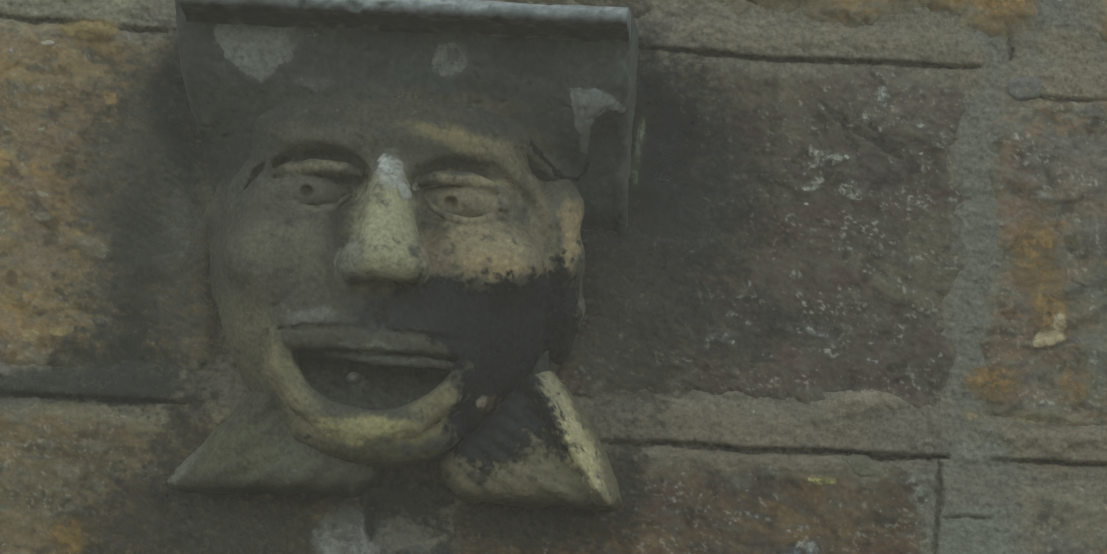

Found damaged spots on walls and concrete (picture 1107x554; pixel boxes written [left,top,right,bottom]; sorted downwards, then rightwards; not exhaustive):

water stain [0,27,230,411]
water stain [359,24,780,484]
spalling [569,87,627,156]
water stain [53,389,651,554]